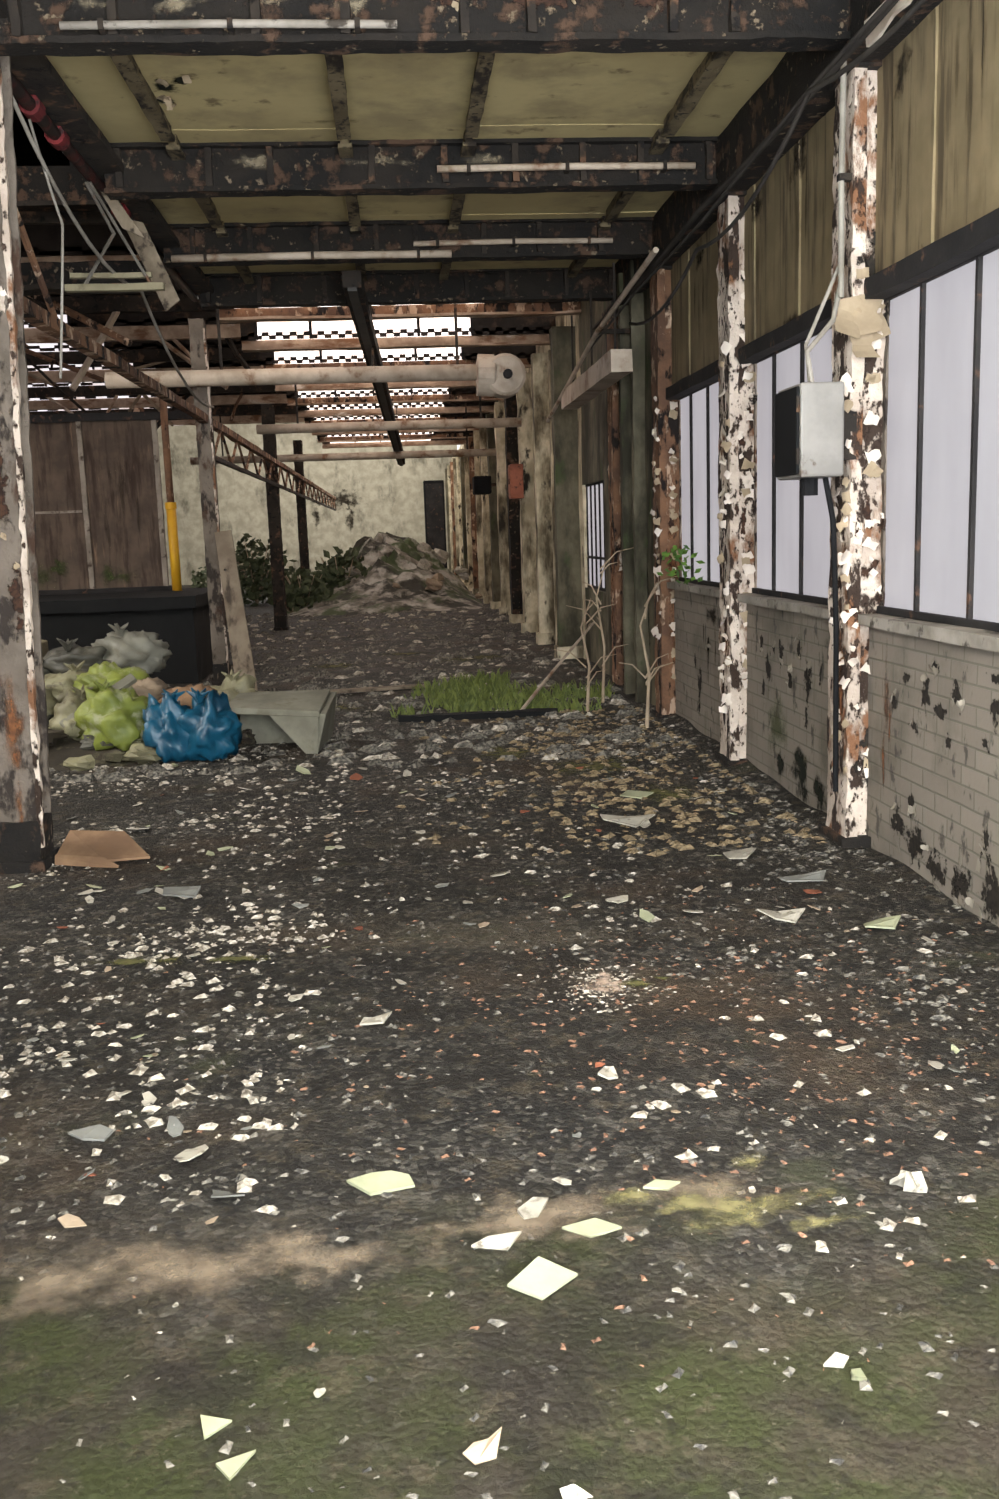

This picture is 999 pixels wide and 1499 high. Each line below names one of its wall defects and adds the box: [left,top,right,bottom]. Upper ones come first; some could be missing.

rust [164,0,186,10]
rust [238,156,266,167]
peeling [833,229,891,425]
peeling [650,396,680,679]
peeling [694,270,886,787]
peeling [890,657,965,749]
peeling [982,674,999,755]
spalling [890,793,999,924]